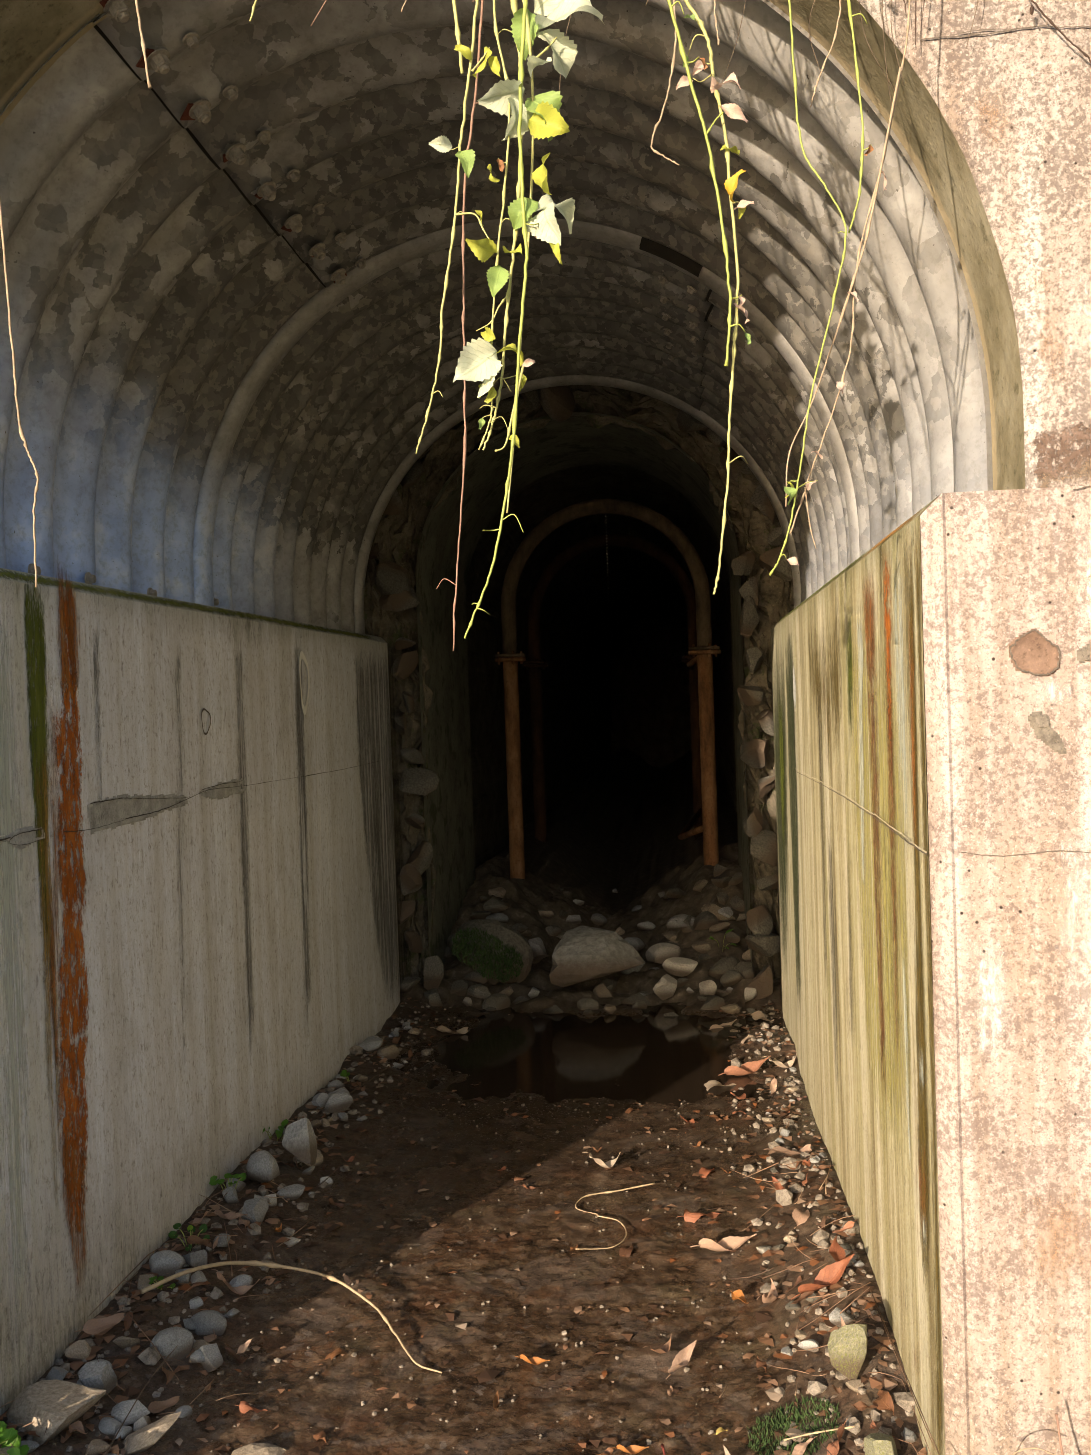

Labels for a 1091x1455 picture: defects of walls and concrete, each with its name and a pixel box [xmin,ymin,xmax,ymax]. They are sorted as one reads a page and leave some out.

water stain [1032,422,1091,488]
corrosion [50,567,89,1283]
crack [0,760,383,845]
water stain [785,636,800,995]
water stain [819,728,852,1080]
corrosion [862,508,929,1288]
water stain [895,541,945,1455]
crack [795,769,1091,864]
spalling [1028,711,1067,754]
spalling [1009,628,1091,676]